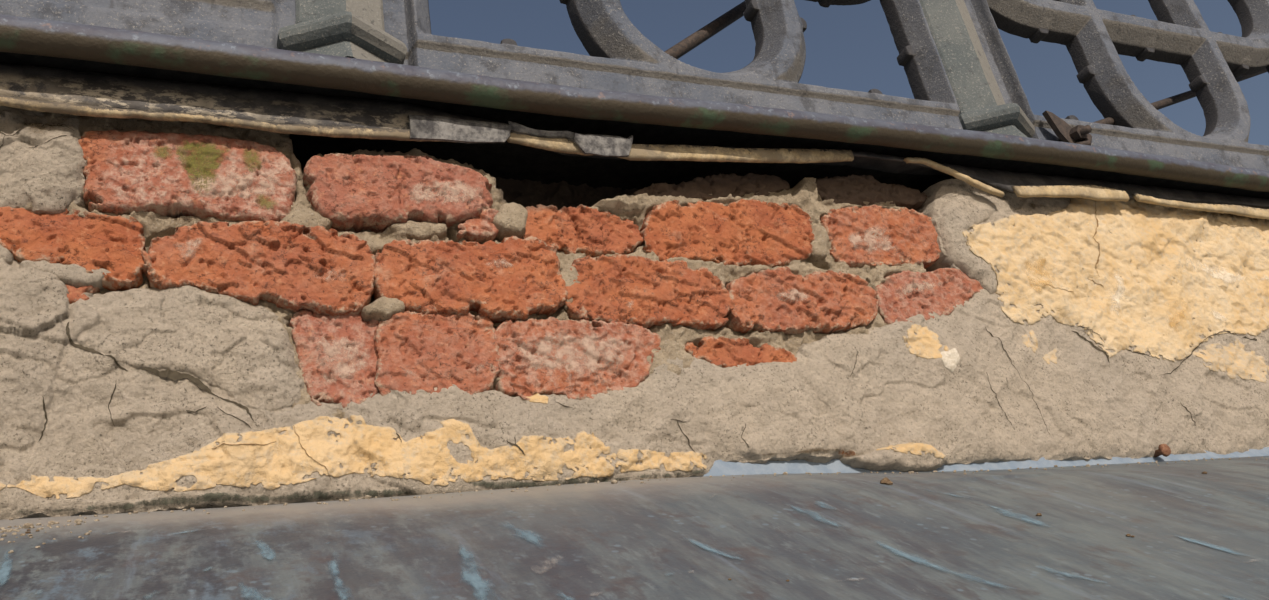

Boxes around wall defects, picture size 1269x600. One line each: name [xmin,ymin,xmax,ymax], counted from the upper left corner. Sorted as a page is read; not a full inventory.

crack [0,124,74,148]
spalling [0,112,1269,499]
crack [39,396,48,441]
crack [66,322,331,479]